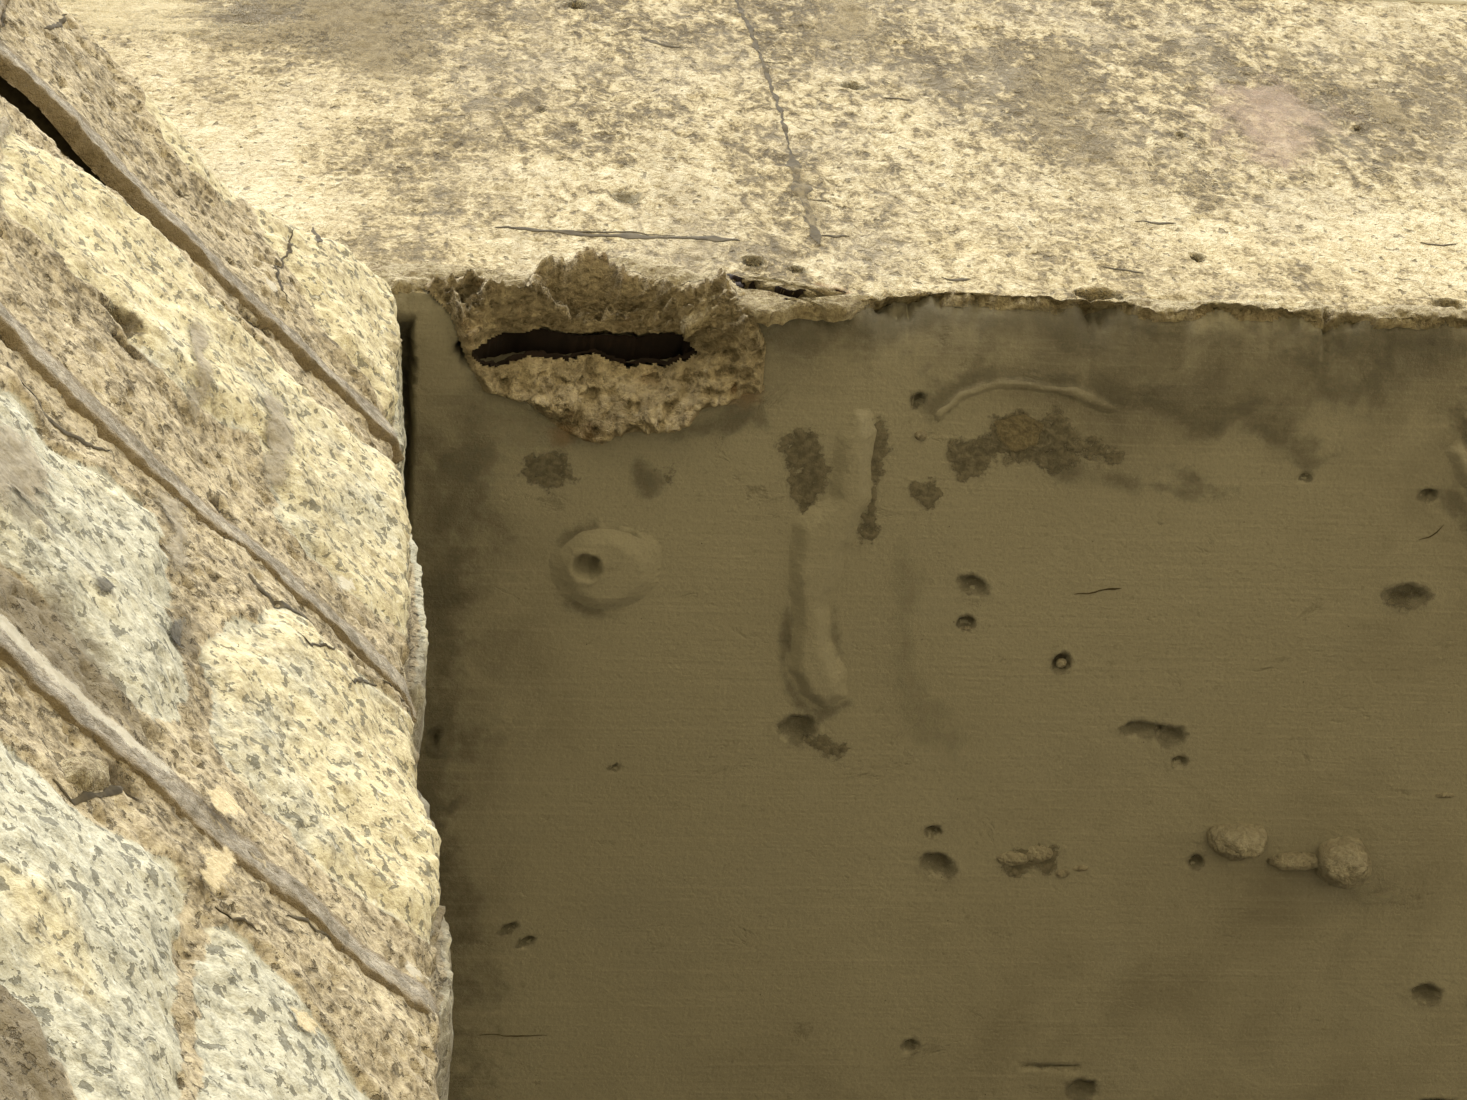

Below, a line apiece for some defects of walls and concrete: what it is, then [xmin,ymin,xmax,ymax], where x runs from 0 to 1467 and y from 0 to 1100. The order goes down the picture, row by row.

crack [735,0,821,244]
spalling [364,246,876,445]
peeling [521,451,577,494]